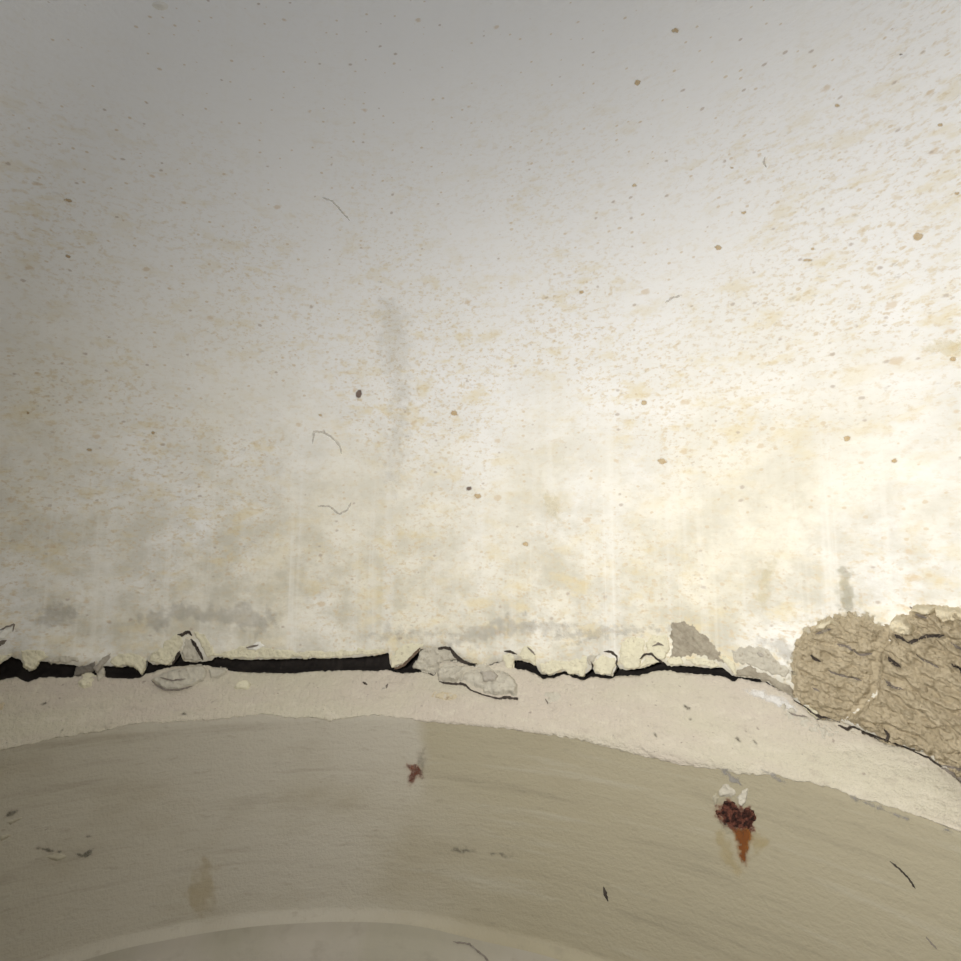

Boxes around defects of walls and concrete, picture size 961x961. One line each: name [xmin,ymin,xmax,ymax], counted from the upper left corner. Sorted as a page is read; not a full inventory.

peeling [0,623,424,688]
crack [0,630,518,700]
peeling [431,660,467,700]
crack [504,650,773,686]
spalling [503,604,961,778]
crack [794,700,961,782]
peeling [737,788,748,807]
corrosion [715,799,756,862]